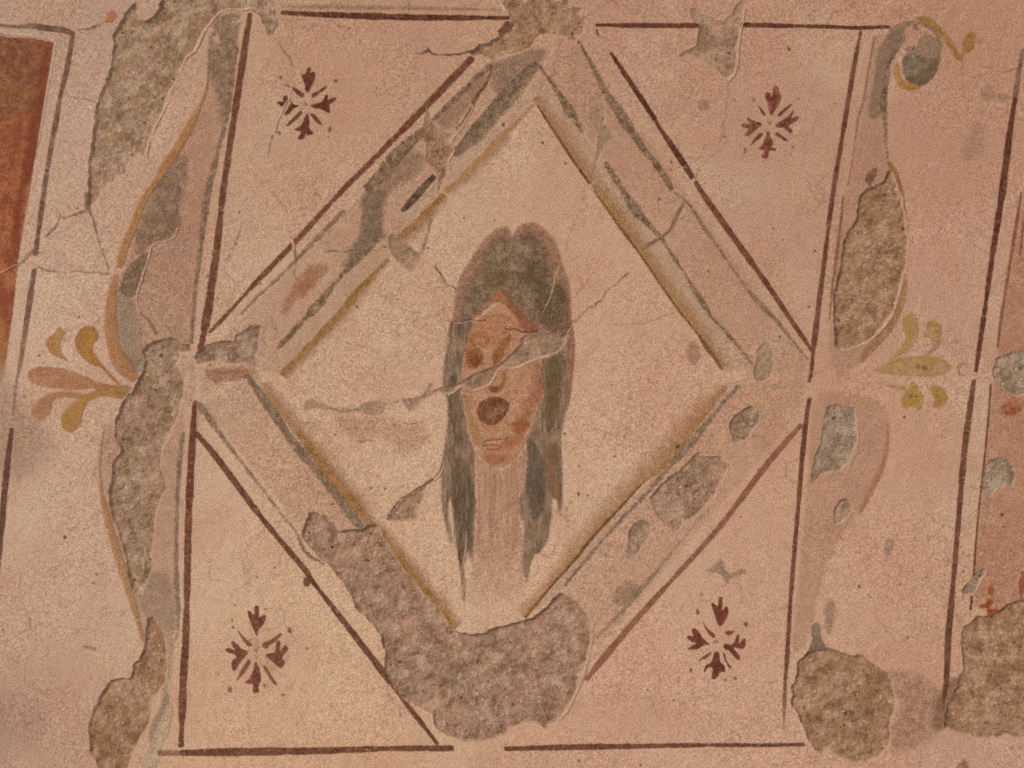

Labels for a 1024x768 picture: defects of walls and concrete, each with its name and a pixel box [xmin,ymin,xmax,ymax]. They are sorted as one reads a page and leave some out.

flaking render [86,0,280,209]
flaking render [470,0,587,61]
flaking render [679,1,746,81]
flaking render [833,168,909,351]
flaking render [992,350,1024,397]
flaking render [108,325,262,595]
flaking render [626,452,728,560]
flaking render [810,404,859,485]
flaking render [88,616,169,768]
flaking render [301,486,594,742]
flaking render [791,623,898,764]
flaking render [944,599,1024,740]